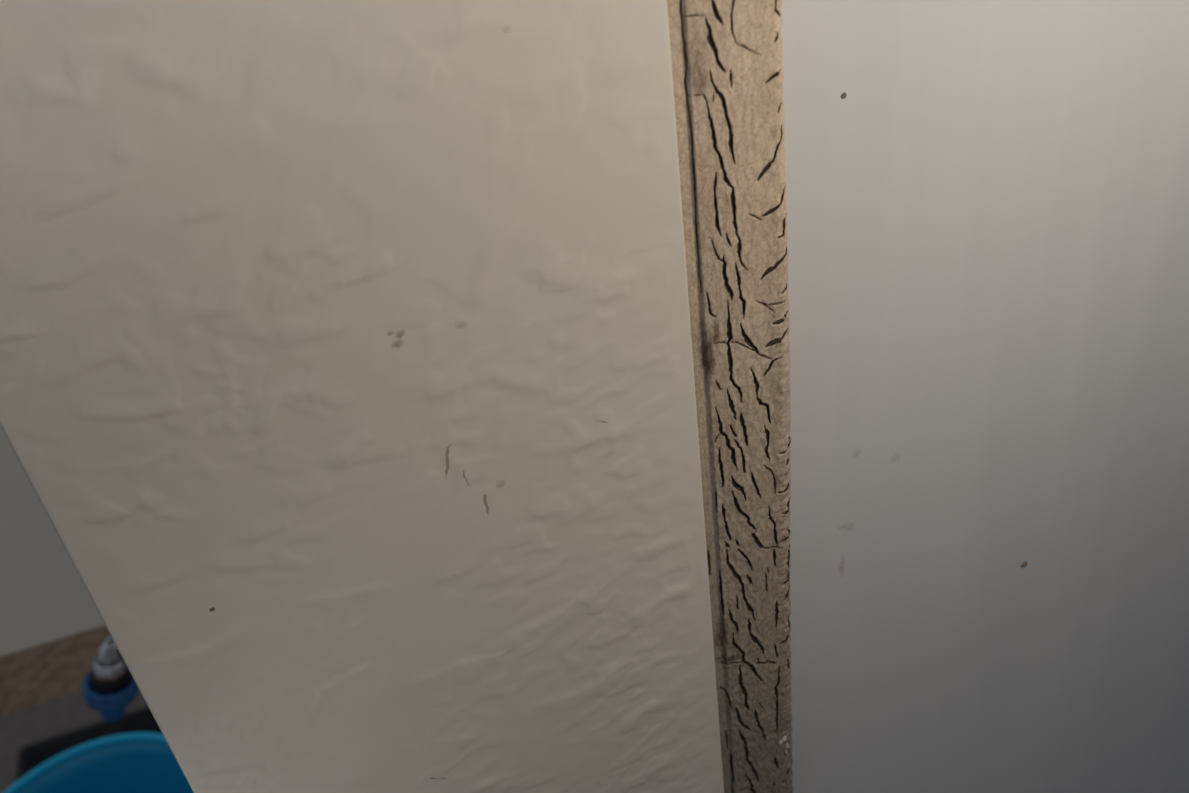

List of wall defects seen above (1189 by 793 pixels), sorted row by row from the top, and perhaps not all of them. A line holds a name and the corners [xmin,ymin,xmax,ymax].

crack [680,0,791,793]